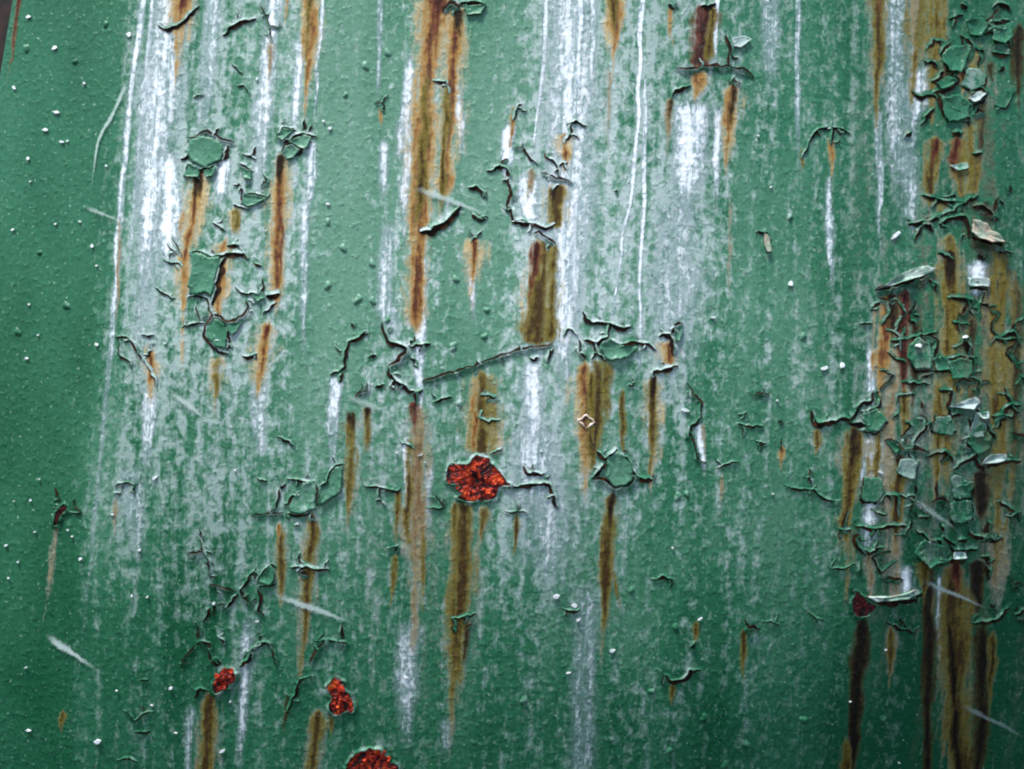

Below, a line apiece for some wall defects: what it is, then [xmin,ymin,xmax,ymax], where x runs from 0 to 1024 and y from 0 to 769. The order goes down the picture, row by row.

water stain [106,0,185,388]
peeling [181,248,281,355]
water stain [252,0,283,181]
rust [406,0,466,329]
rust [520,240,558,345]
water stain [518,0,596,380]
rust [567,360,627,487]
water stain [611,0,722,365]
peeling [810,265,1023,569]
peeling [891,188,1015,254]
peeling [911,8,1014,126]
rust [917,235,1023,769]